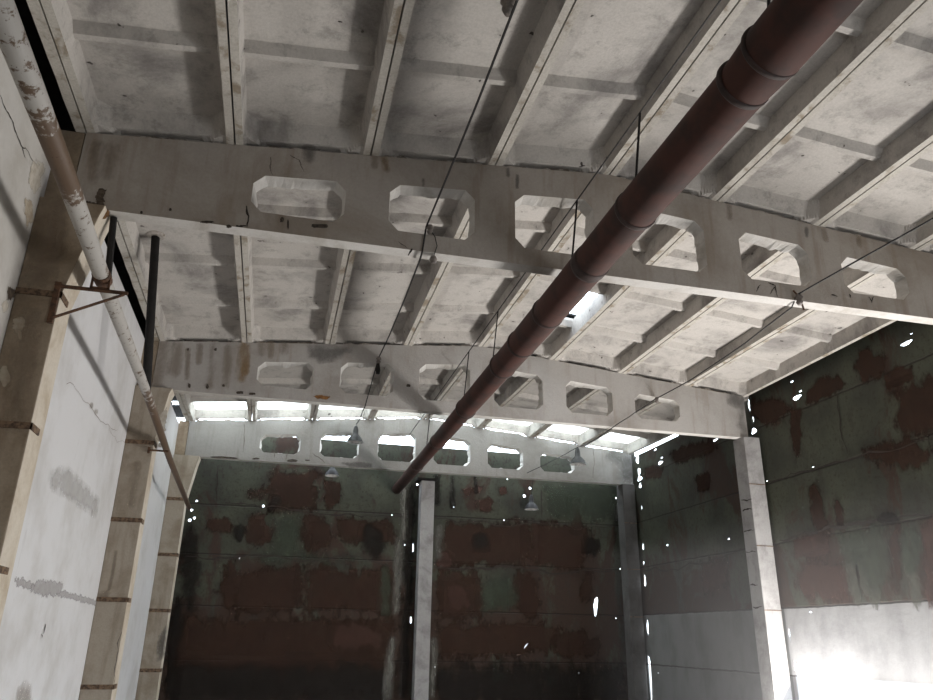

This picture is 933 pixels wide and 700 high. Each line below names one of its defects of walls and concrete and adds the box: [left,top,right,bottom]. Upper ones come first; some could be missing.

crack [0,95,33,161]
rust [86,188,110,219]
rust [645,464,664,480]
rust [670,438,718,465]
rust [749,375,846,457]
rust [853,347,933,471]
rust [206,466,404,616]
rust [435,486,601,664]